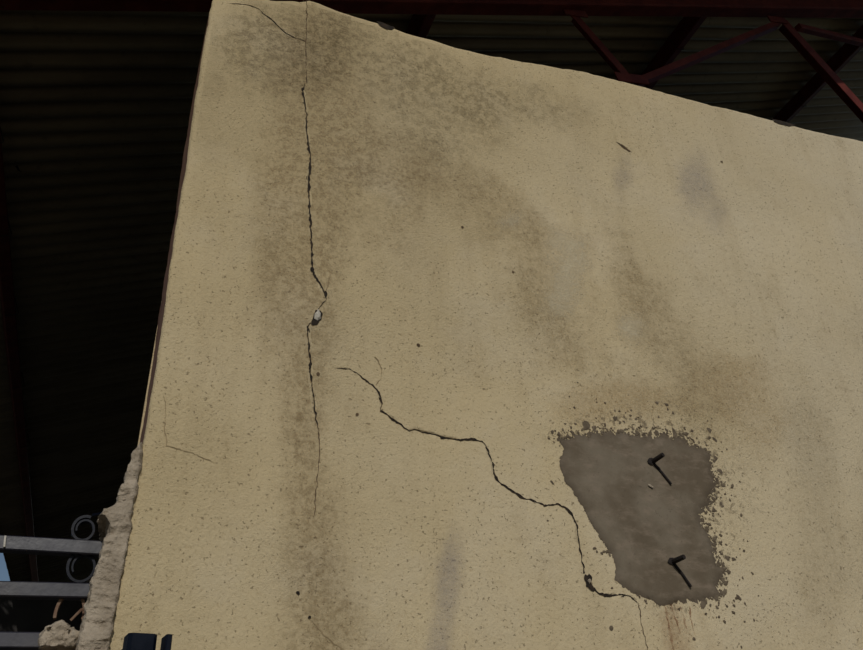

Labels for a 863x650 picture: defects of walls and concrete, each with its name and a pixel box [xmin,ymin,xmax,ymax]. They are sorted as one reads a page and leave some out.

crack [232,1,331,515]
spalling [75,442,143,650]
crack [338,358,648,650]
spalling [584,574,595,591]